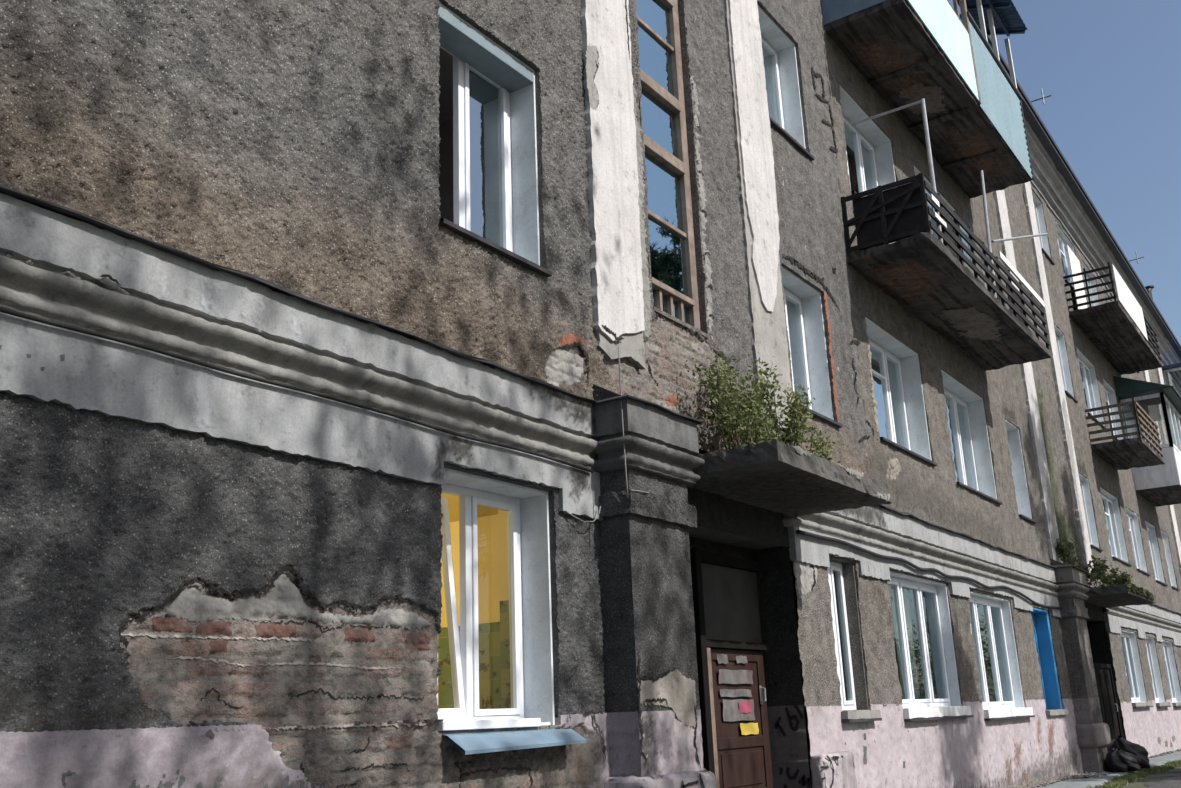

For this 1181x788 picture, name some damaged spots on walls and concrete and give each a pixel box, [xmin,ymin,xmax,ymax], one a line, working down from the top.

flaking render [603,75,730,450]
crack [784,254,841,312]
flaking render [544,333,590,387]
crack [850,339,874,442]
flaking render [118,566,607,788]
flaking render [638,669,697,728]